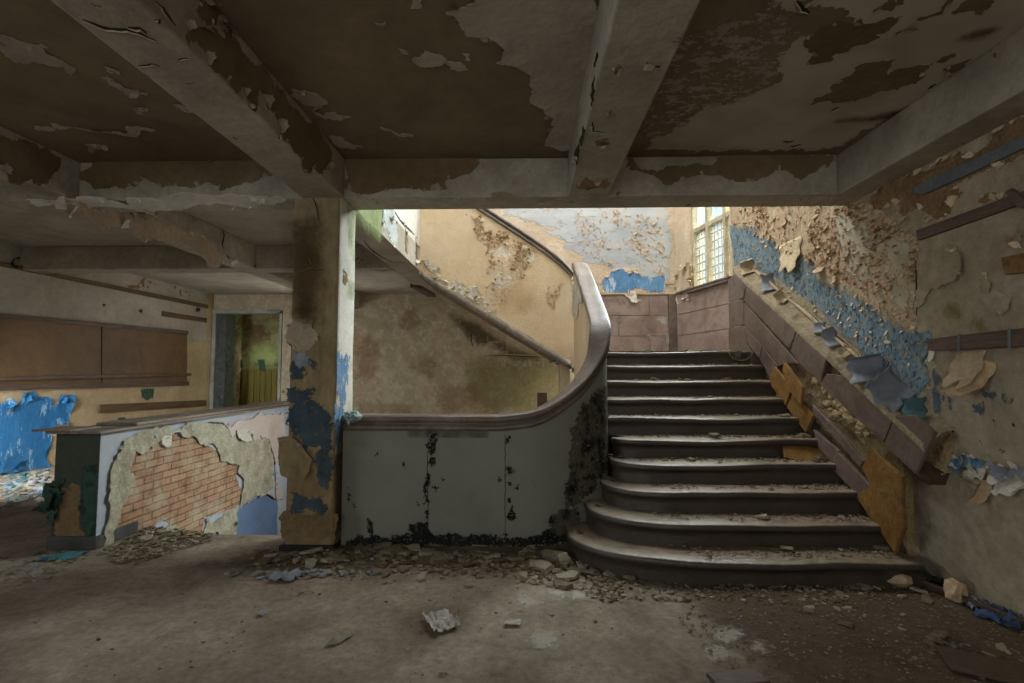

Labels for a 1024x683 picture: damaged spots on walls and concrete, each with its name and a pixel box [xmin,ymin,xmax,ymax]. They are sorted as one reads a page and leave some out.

crack [82,0,194,85]
peeling [0,65,286,269]
peeling [184,0,481,195]
peeling [445,0,693,304]
peeling [626,0,1024,185]
water stain [290,222,319,317]
peeling [382,210,538,312]
peeling [728,117,1024,422]
peeling [0,391,78,475]
spalling [32,319,362,546]
water stain [336,416,356,524]
water stain [346,432,567,547]